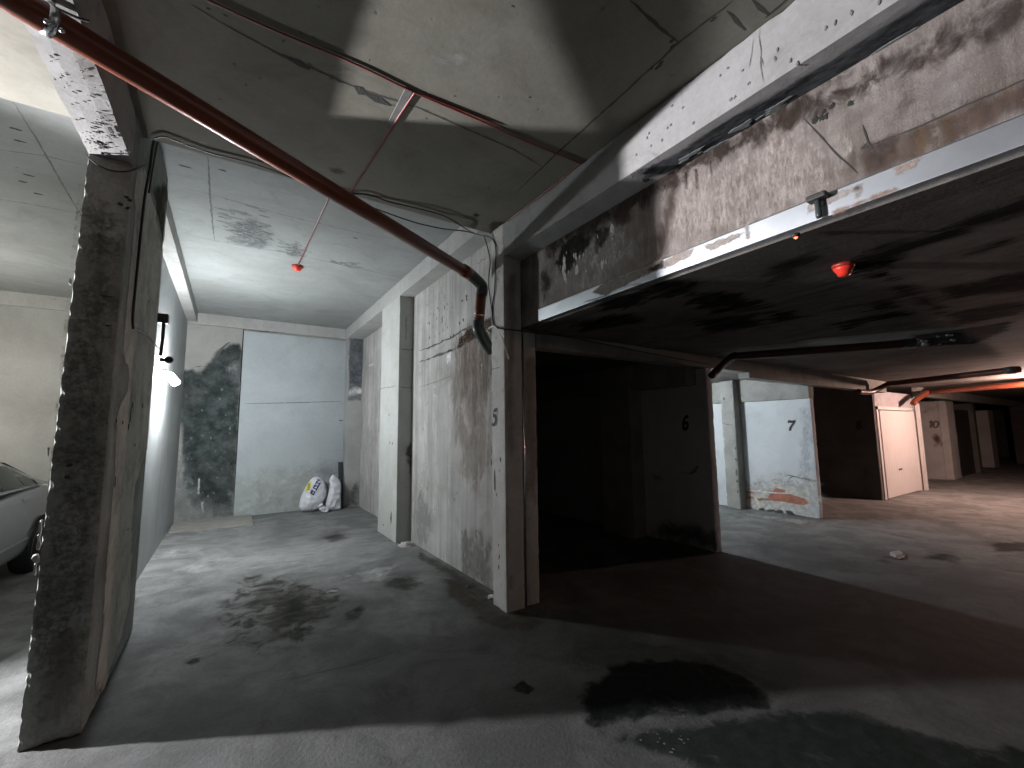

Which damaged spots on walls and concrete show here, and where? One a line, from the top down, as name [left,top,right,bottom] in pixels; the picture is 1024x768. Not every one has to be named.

damp [541,0,1023,298]
crack [803,79,1024,173]
flaking render [560,251,587,284]
damp [571,279,808,333]
damp [822,199,1024,346]
crack [381,318,491,389]
damp [174,342,242,520]
flaking render [734,447,815,515]